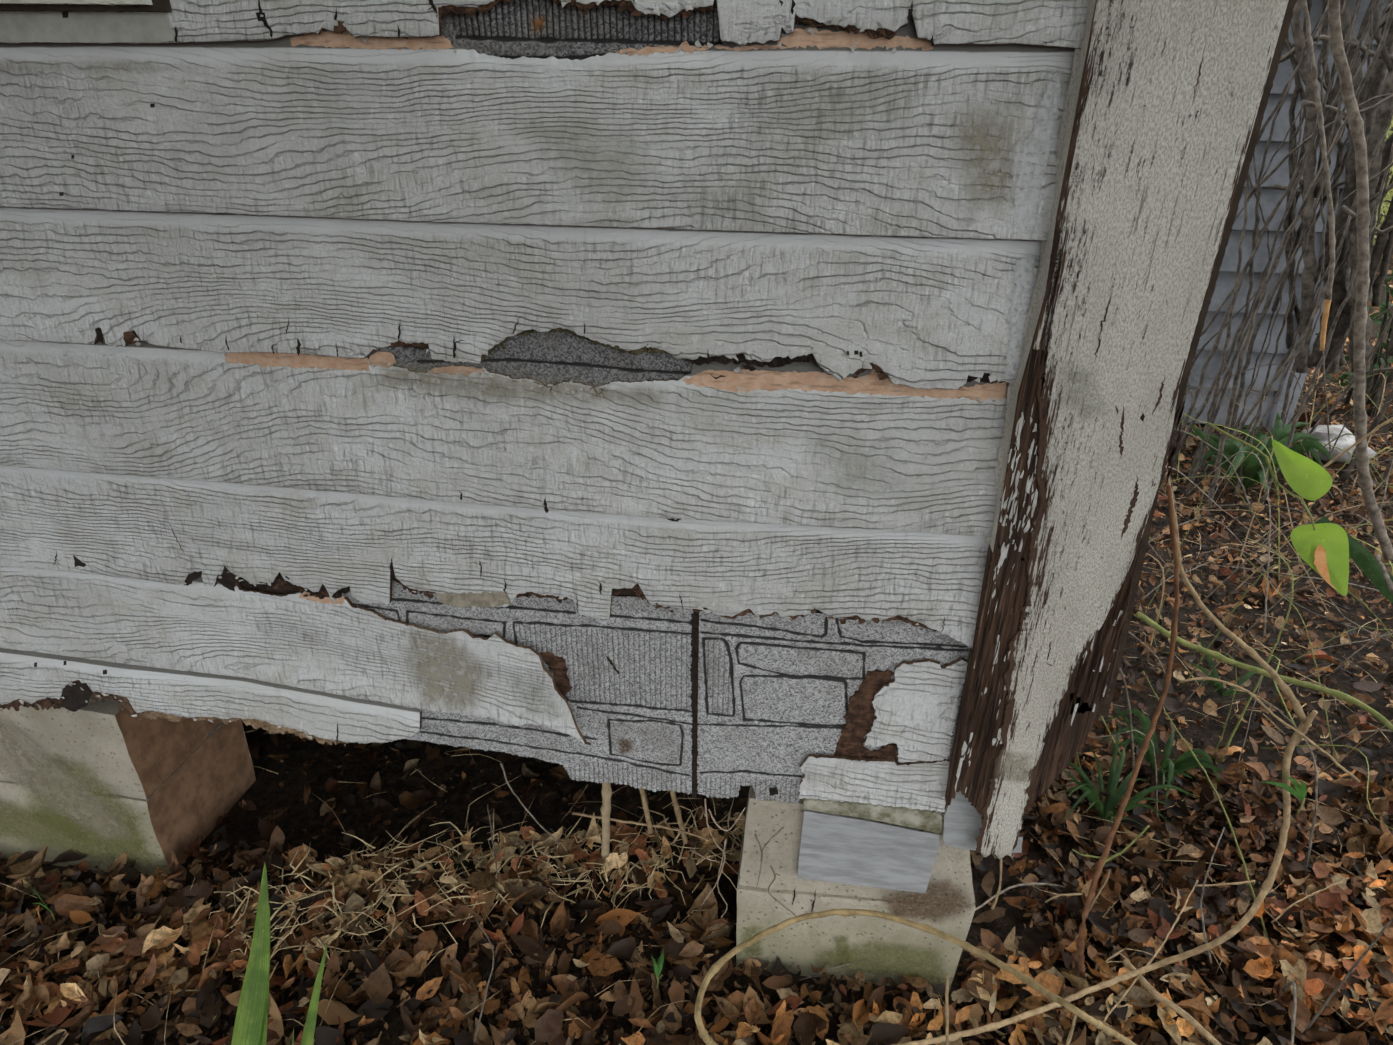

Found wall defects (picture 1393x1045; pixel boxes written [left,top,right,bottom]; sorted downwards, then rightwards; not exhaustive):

peeling [290,19,457,52]
peeling [613,17,934,56]
crack [907,1,934,47]
crack [271,321,301,356]
peeling [224,339,407,371]
crack [453,335,465,359]
peeling [426,344,585,394]
crack [512,378,605,397]
peeling [681,0,1199,813]
peeling [218,576,345,606]
peeling [406,588,542,611]
crack [679,595,698,799]